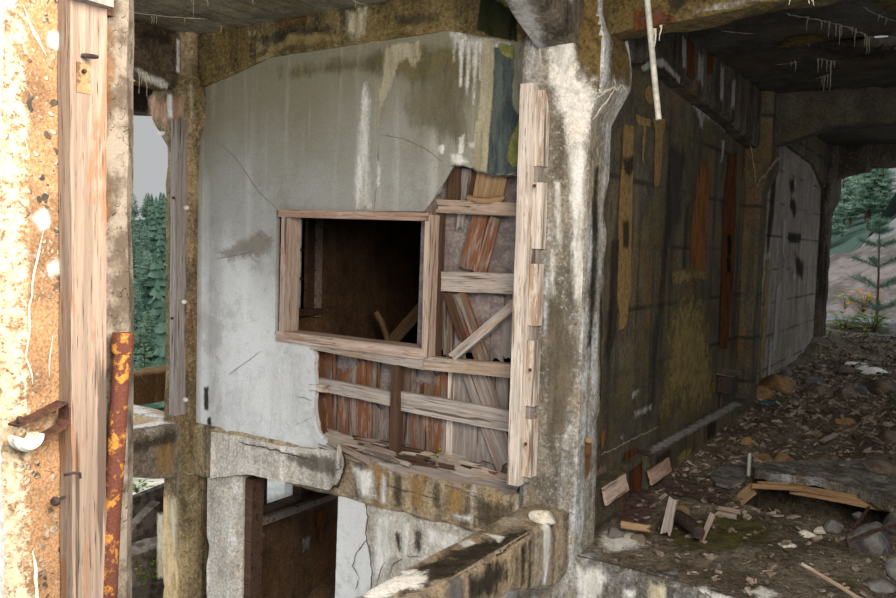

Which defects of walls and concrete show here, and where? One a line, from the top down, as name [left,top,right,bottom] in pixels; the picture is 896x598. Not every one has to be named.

crack [134,0,222,34]
leakage [258,7,519,210]
leakage [625,37,686,88]
leakage [720,66,736,107]
leakage [550,181,562,291]